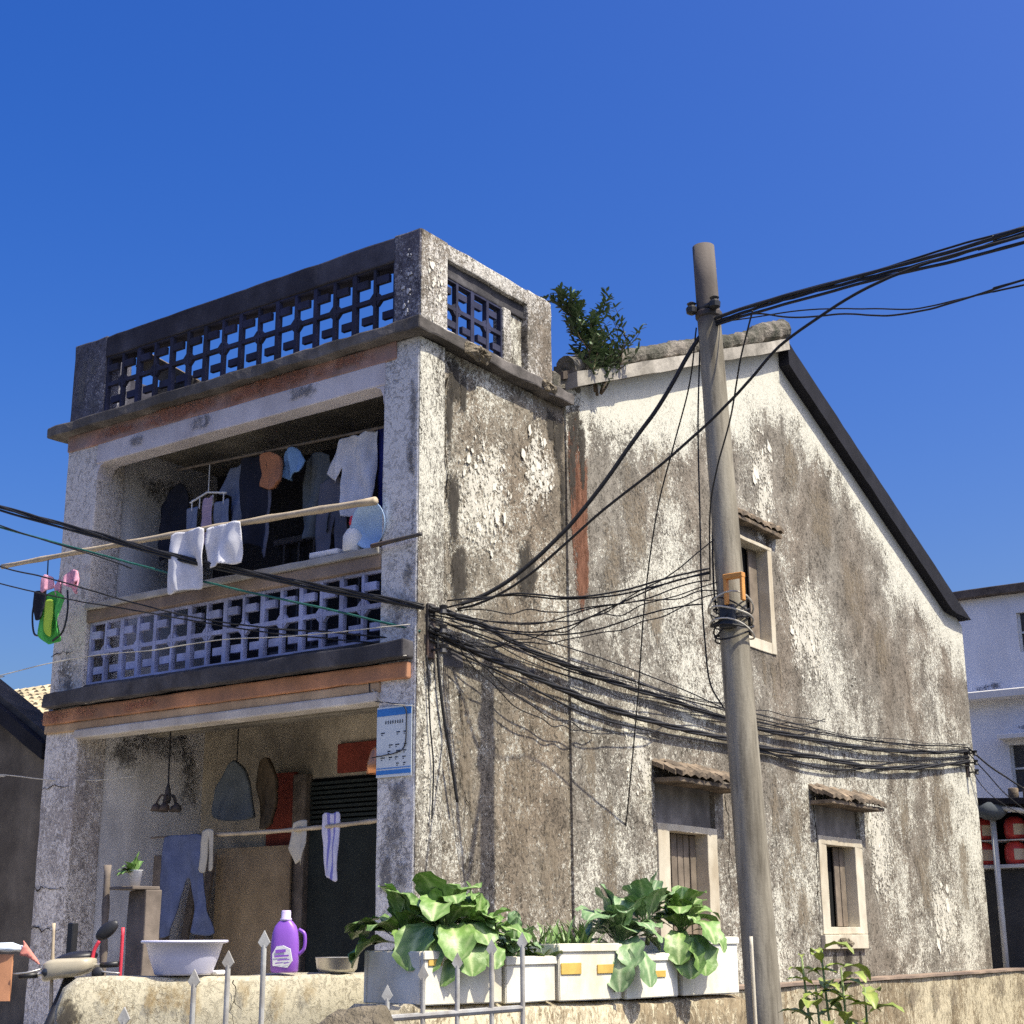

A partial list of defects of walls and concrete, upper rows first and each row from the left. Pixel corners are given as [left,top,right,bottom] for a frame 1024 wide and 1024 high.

leakage [447,357,467,457]
leakage [448,471,468,607]
peeling [458,435,512,557]
leakage [495,540,538,635]
peeling [521,424,552,505]
leakage [547,402,586,538]
corrosion [568,419,589,610]
leakage [645,592,664,643]
leakage [110,735,198,809]
leakage [771,776,816,945]
leakage [933,771,970,910]
leakage [833,951,862,978]